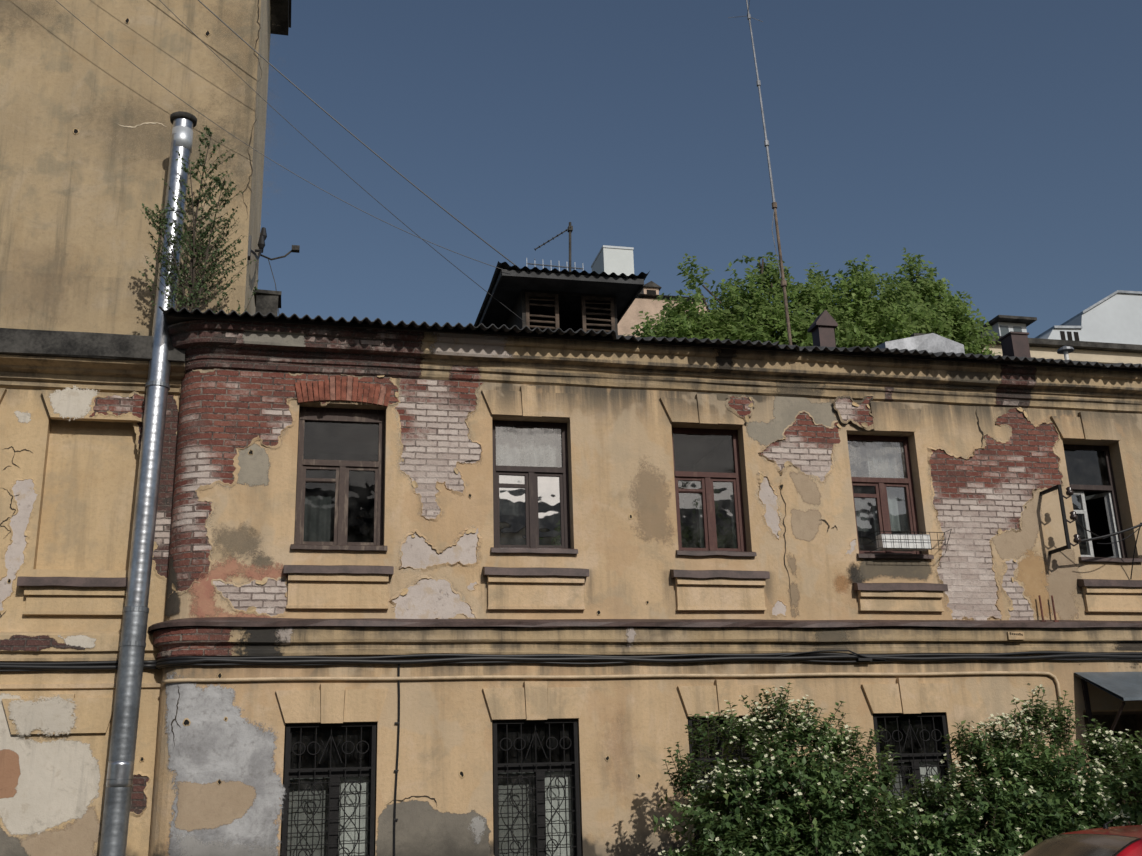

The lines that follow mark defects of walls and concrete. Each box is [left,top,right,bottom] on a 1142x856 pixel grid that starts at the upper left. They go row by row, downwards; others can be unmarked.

crack [243,0,262,220]
crack [0,446,33,536]
flaking render [0,478,40,614]
flaking render [49,385,146,456]
flaking render [152,368,488,645]
flaking render [756,395,875,540]
flaking render [927,407,1064,620]
flaking render [0,635,97,651]
peeling [0,693,101,835]
leakage [375,800,491,856]